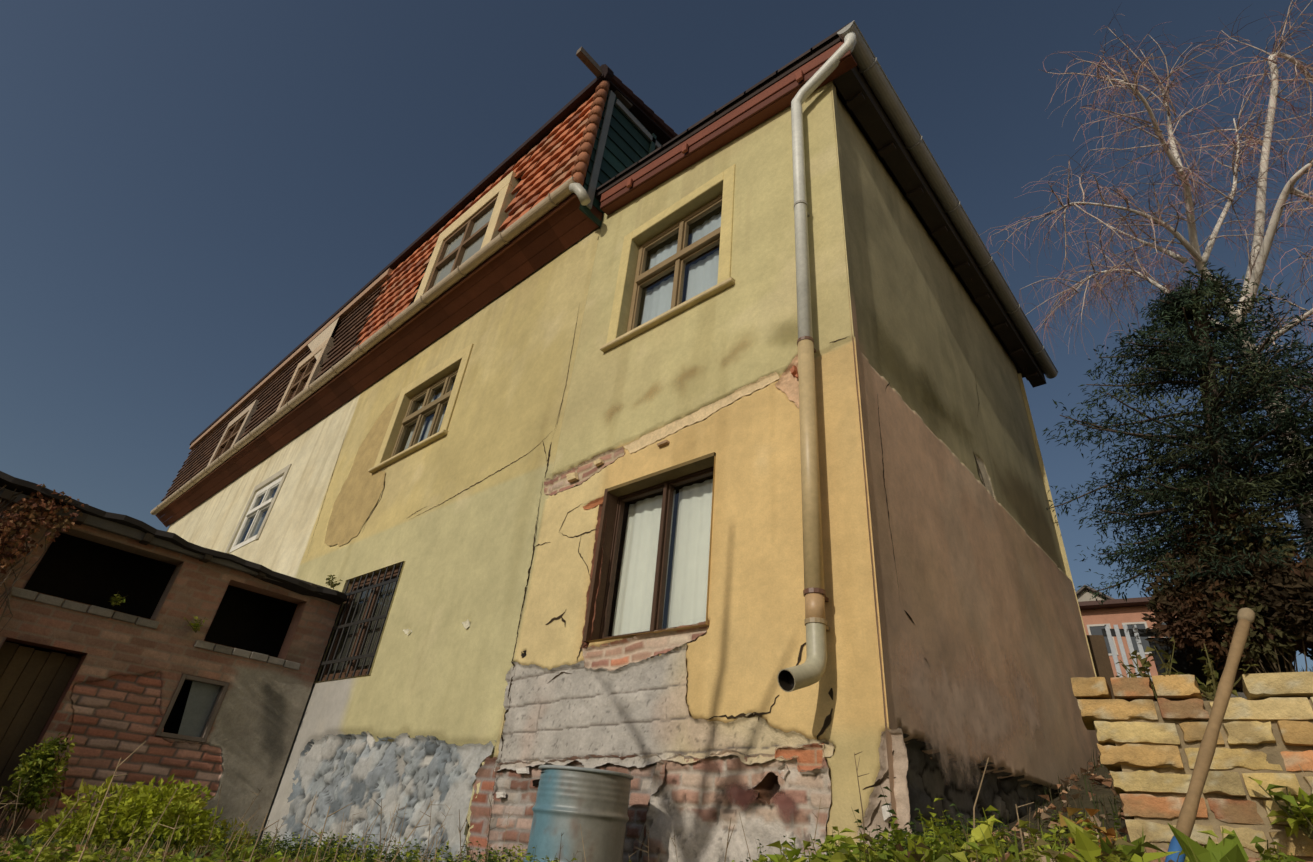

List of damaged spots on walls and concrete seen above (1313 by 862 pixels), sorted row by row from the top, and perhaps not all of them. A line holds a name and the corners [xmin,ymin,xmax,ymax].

peeling [325,395,400,546]
spalling [544,354,799,495]
crack [406,310,599,829]
spalling [56,672,223,832]
spalling [276,496,834,862]
spalling [857,727,1067,849]